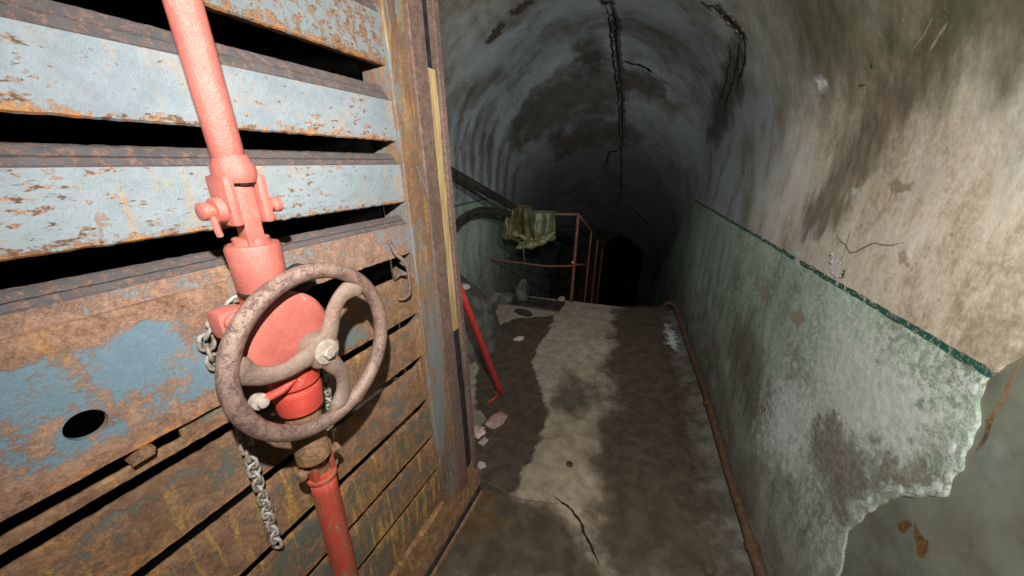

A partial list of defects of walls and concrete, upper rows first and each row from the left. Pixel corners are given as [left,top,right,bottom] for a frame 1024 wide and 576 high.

damp [510,39,660,159]
crack [599,0,674,227]
crack [701,1,746,109]
damp [803,18,948,240]
damp [435,316,598,576]
crack [481,479,599,564]
damp [592,306,718,576]
peeling [812,372,979,524]
corrosion [899,520,928,557]
corrosion [976,357,1024,452]